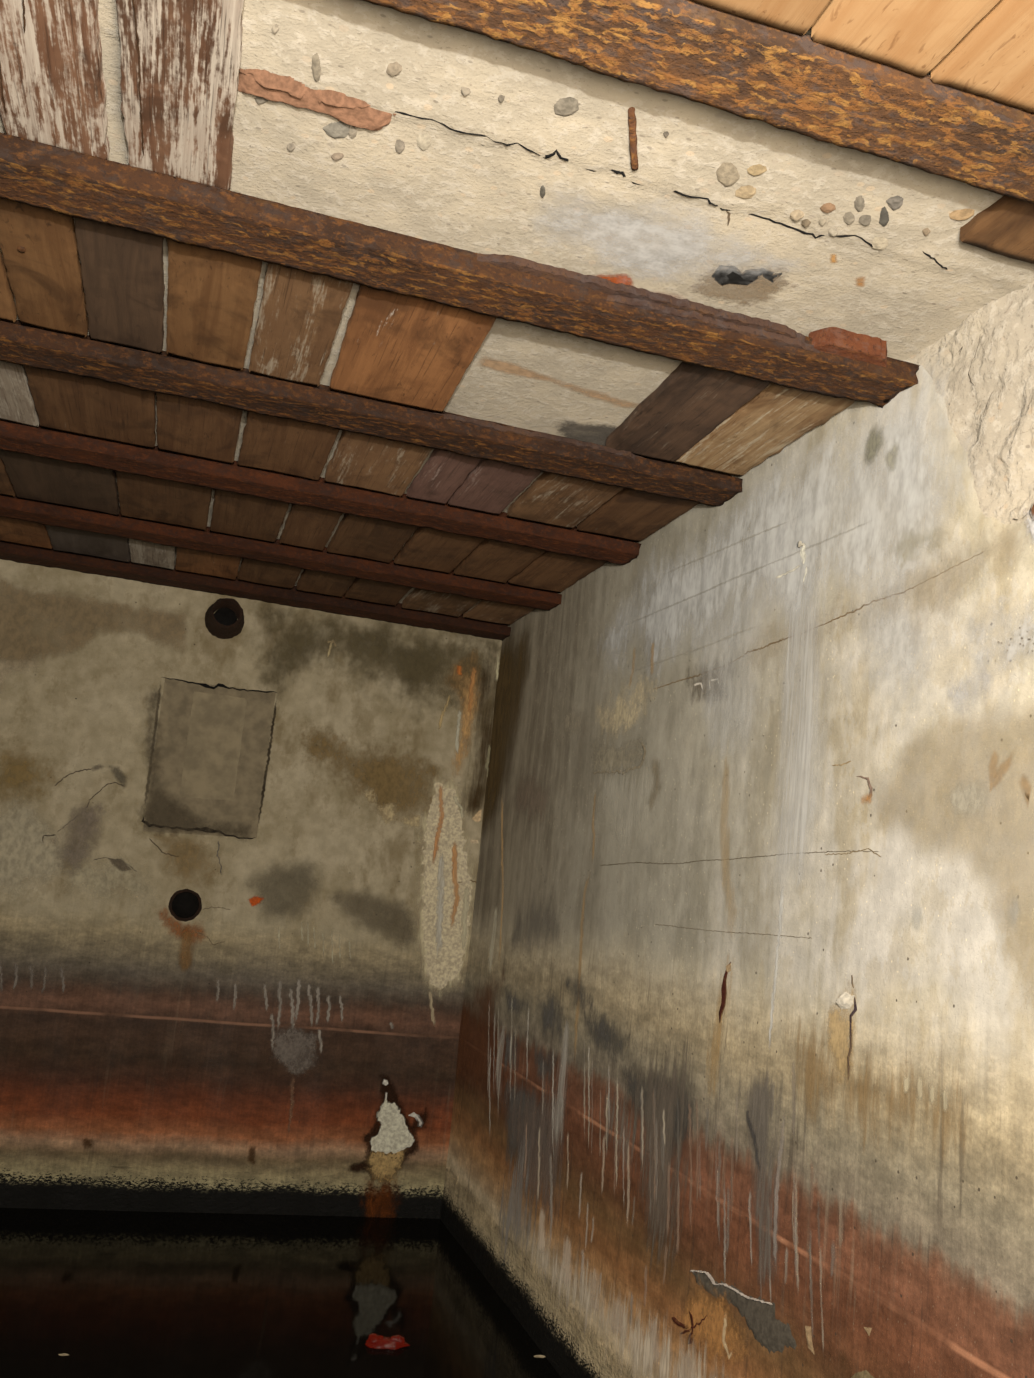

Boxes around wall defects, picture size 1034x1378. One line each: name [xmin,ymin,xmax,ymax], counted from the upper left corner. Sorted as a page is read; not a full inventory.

crack [395,111,640,185]
spalling [694,265,789,304]
crack [673,191,873,247]
crack [904,252,947,269]
spalling [906,281,1034,525]
damp [0,583,185,659]
damp [259,611,527,1023]
damp [264,980,343,1073]
damp [457,987,497,1079]
corrosion [712,962,731,1066]
corrosion [671,1311,707,1344]
peeling [684,1270,814,1366]